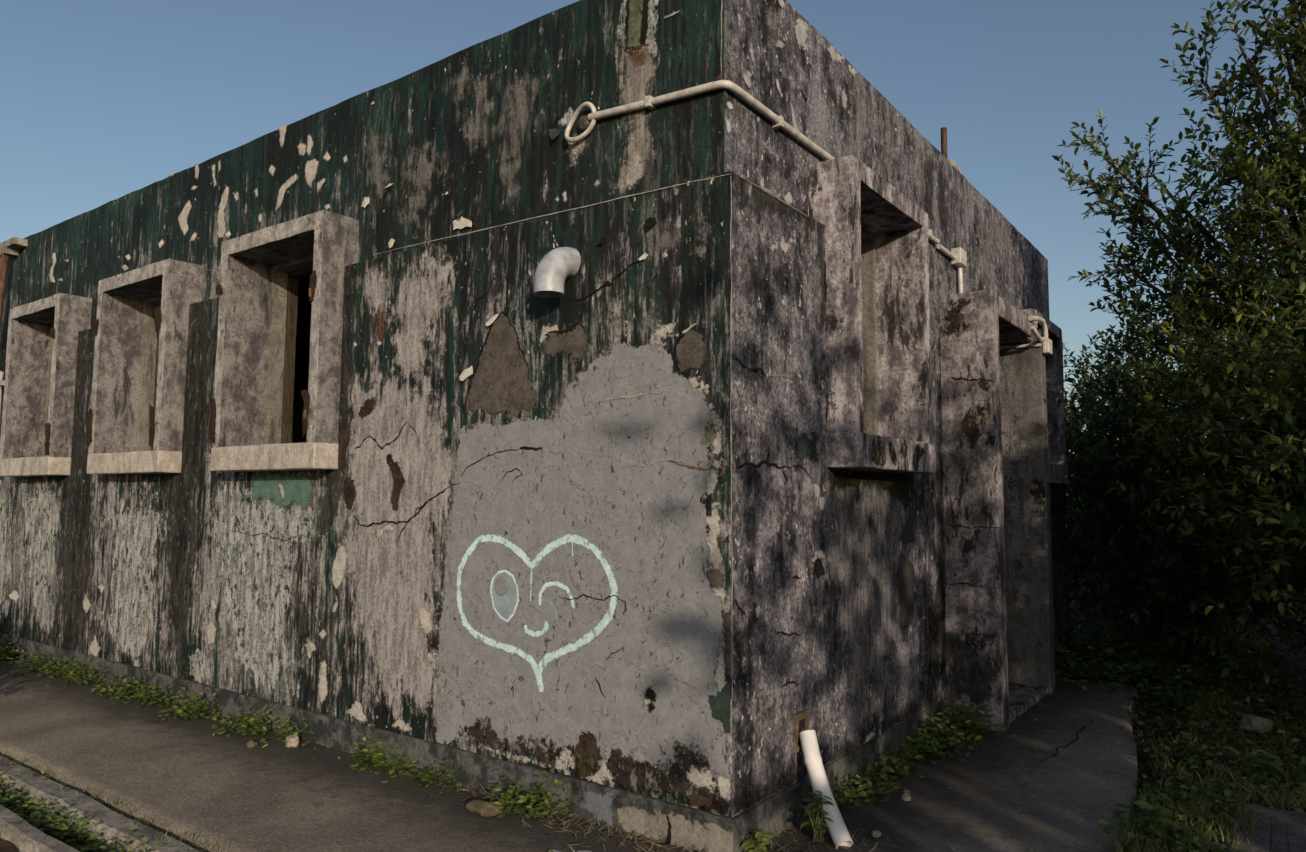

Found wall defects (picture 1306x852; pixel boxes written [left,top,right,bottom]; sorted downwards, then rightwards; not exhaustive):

peeling [178,161,239,241]
peeling [258,125,347,222]
leakage [612,42,660,194]
leakage [54,329,98,653]
leakage [159,298,217,678]
peeling [189,471,328,706]
leakage [319,244,458,721]
crack [353,446,542,543]
peeling [650,320,726,601]
leakage [819,339,1003,765]
spalling [485,730,743,852]
leakage [459,716,808,815]